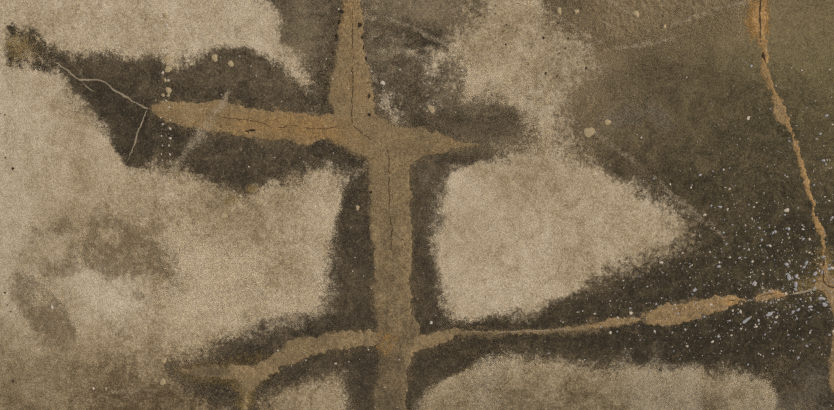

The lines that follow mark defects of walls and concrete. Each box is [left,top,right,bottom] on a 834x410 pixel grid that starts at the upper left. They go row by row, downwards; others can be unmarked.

crack [55,62,149,158]
damp [5,0,380,410]
crack [150,0,788,410]
damp [360,0,834,410]
crack [751,0,834,317]
crack [826,327,834,392]